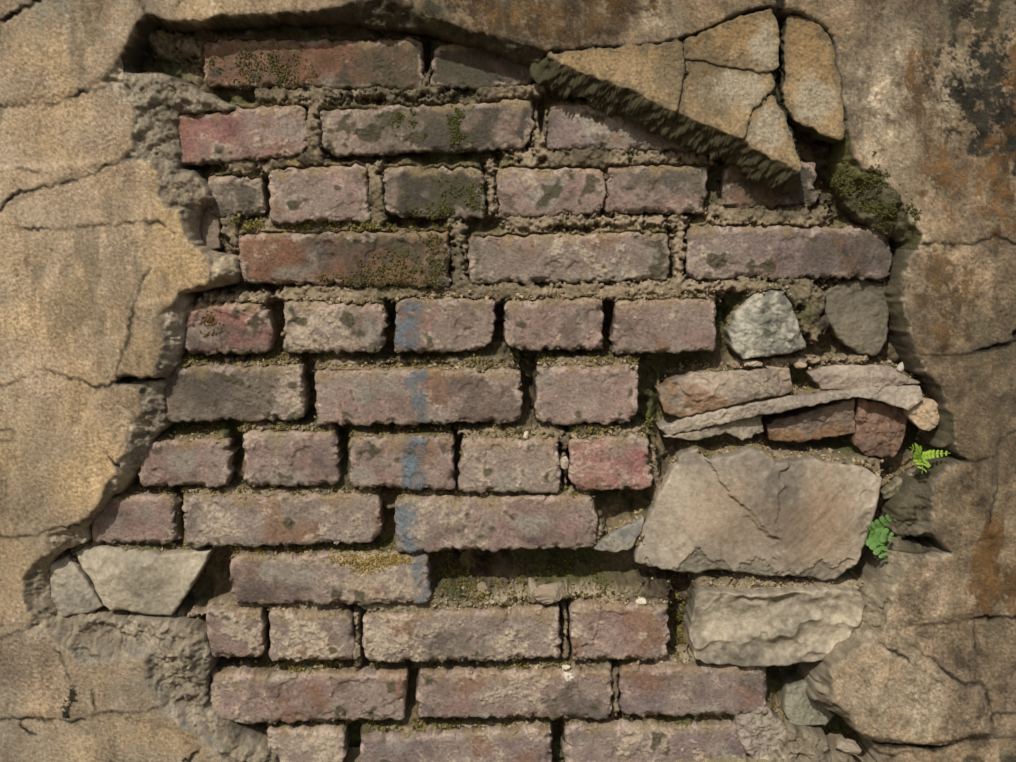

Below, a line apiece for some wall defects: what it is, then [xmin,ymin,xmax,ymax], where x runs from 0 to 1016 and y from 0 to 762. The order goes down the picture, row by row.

crack [0,0,42,23]
water stain [925,0,1016,176]
crack [0,164,111,211]
peeling [105,0,922,383]
crack [935,330,1016,356]
crack [51,371,162,388]
spalling [24,407,174,668]
spalling [824,372,959,662]
crack [973,614,1016,622]
spalling [184,664,217,699]
spalling [785,687,880,762]
spalling [343,748,361,762]